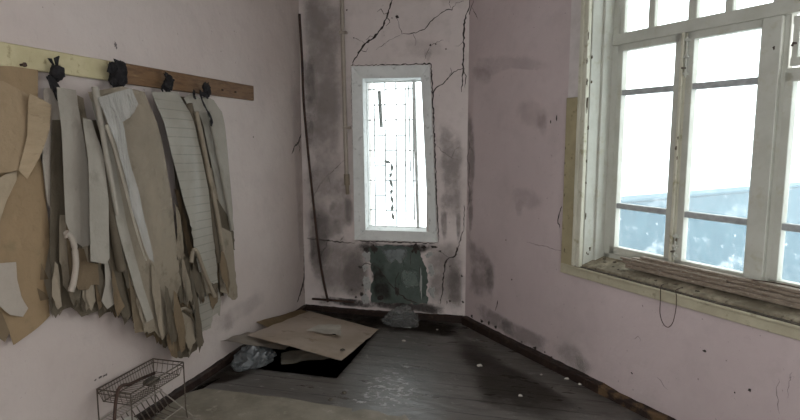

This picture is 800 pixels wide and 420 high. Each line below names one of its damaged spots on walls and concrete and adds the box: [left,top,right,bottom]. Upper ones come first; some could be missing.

crack [351,0,477,118]
crack [308,139,472,303]
flaking render [351,244,441,305]